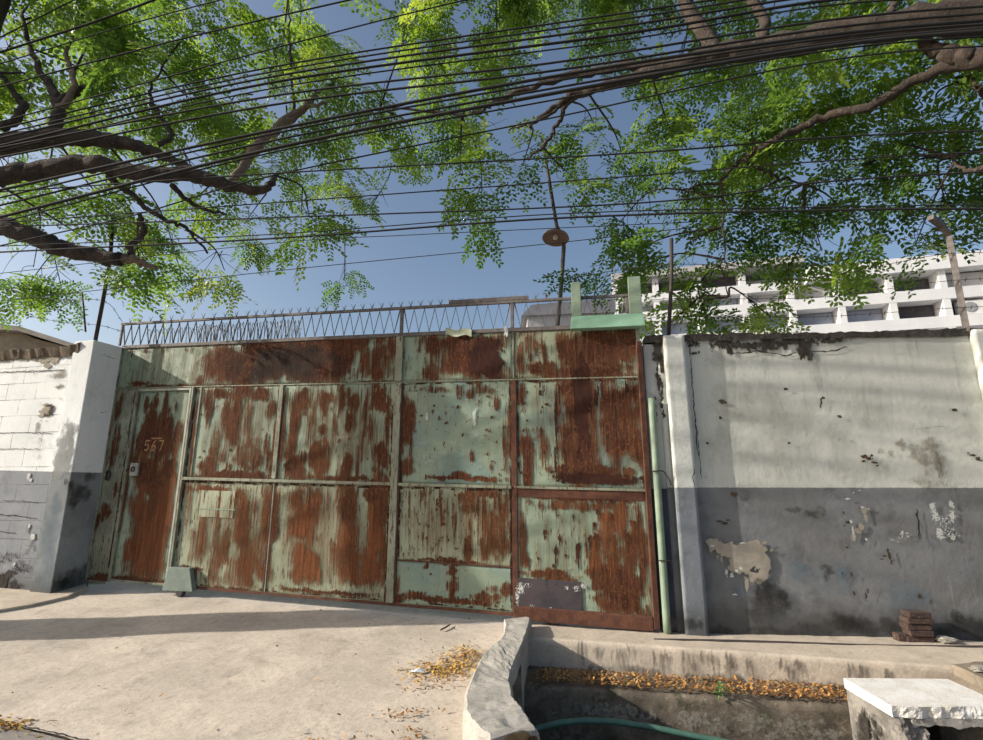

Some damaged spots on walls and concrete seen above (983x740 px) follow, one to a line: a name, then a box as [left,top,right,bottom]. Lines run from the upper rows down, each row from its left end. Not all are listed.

water stain [687,338,852,361]
water stain [896,439,944,467]
rust [90,329,651,616]
peeling [844,507,870,542]
peeling [928,500,960,540]
mould [0,551,32,589]
peeling [706,538,774,591]
spalling [504,731,538,740]